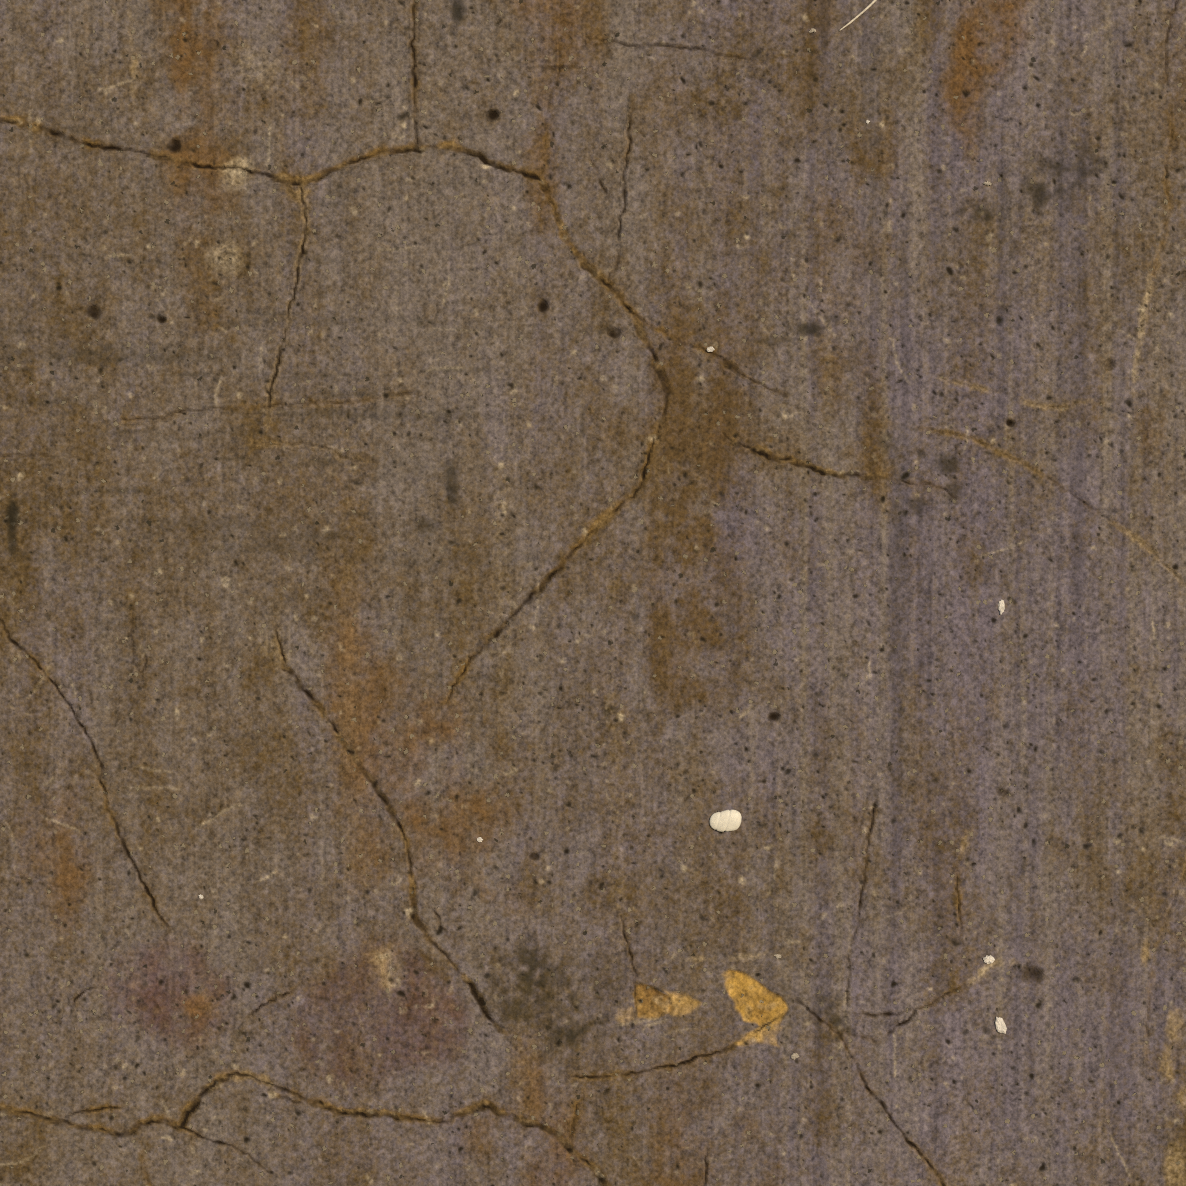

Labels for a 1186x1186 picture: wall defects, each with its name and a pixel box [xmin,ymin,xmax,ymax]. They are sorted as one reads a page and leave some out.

corrosion [932,0,1038,166]
crack [0,0,790,717]
crack [721,429,962,501]
crack [0,609,171,932]
crack [268,616,512,1038]
crack [0,790,1027,1186]
spalling [614,983,705,1028]
spalling [718,968,799,1060]